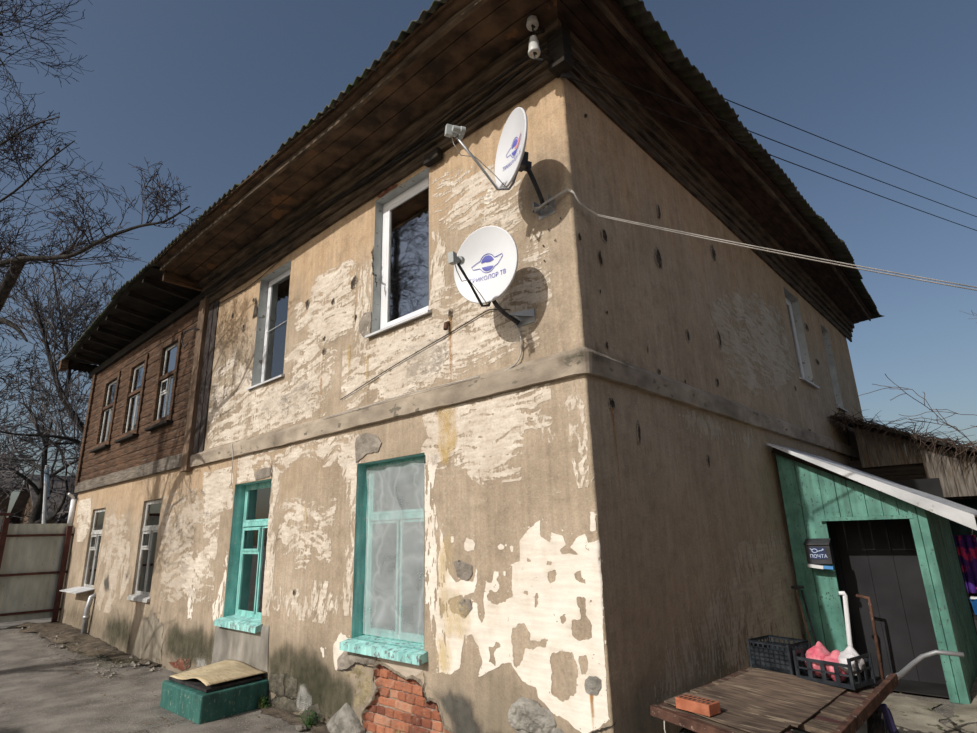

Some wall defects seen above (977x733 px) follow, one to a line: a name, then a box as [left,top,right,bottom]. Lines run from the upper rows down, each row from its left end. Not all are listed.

flaking render [207,161,556,449]
flaking render [77,498,91,542]
flaking render [96,514,131,613]
flaking render [160,433,381,624]
flaking render [421,380,610,733]
flaking render [320,633,453,733]